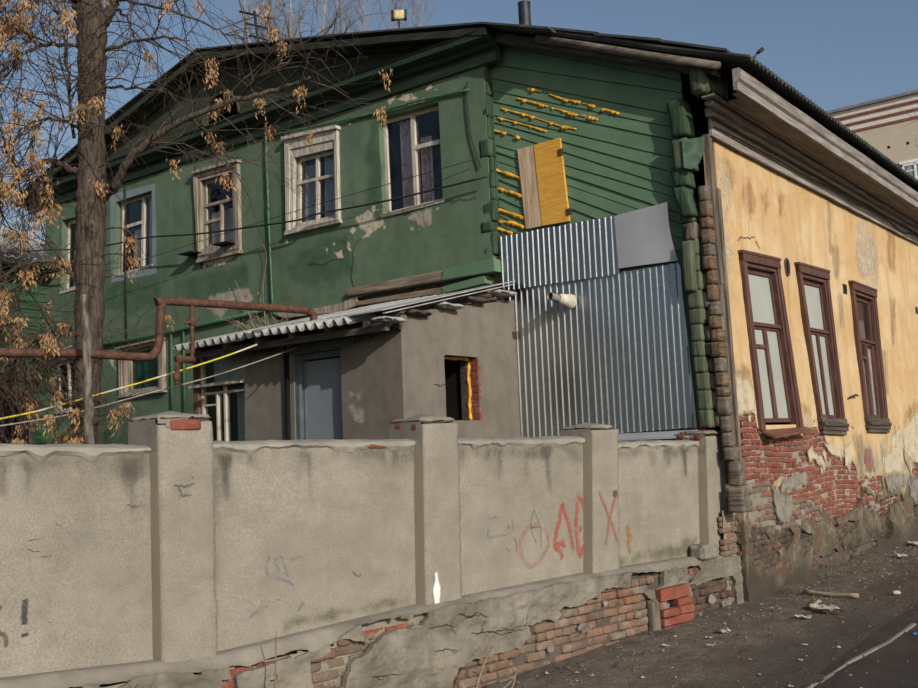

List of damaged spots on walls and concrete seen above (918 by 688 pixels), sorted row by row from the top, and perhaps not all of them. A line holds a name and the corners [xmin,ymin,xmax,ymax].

peeling [387,84,436,106]
peeling [326,206,386,258]
peeling [408,207,439,231]
peeling [201,288,262,320]
spalling [735,367,918,569]
spalling [221,613,424,688]
crack [430,607,528,652]
spalling [450,572,660,688]